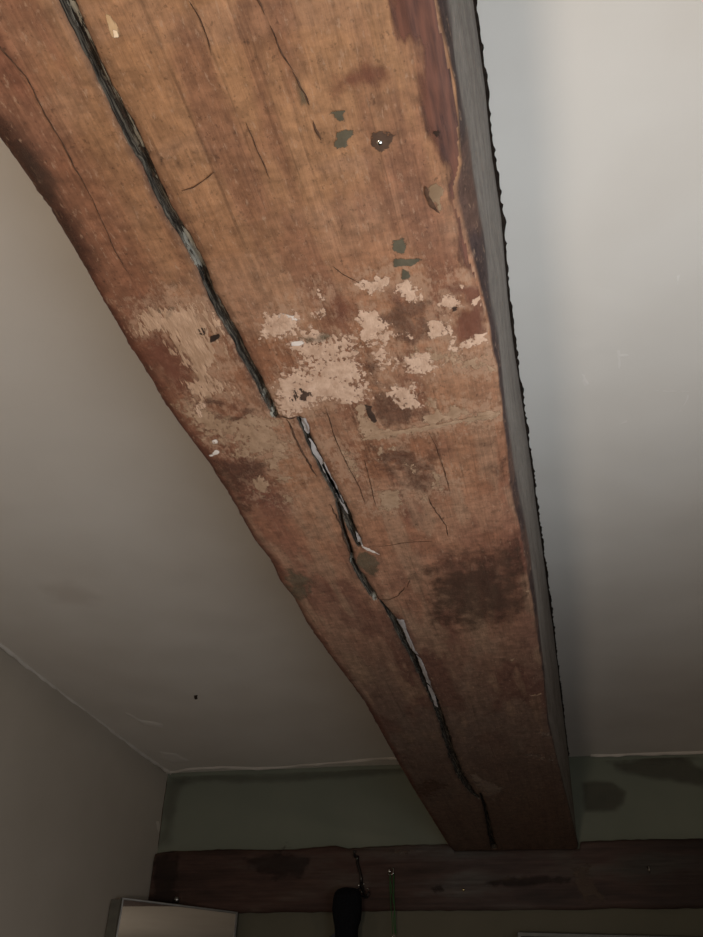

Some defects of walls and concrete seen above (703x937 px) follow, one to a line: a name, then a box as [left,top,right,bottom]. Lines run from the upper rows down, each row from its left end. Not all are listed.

crack [59,0,497,849]
peeling [129,285,500,497]
peeling [354,273,423,303]
water stain [620,758,703,783]